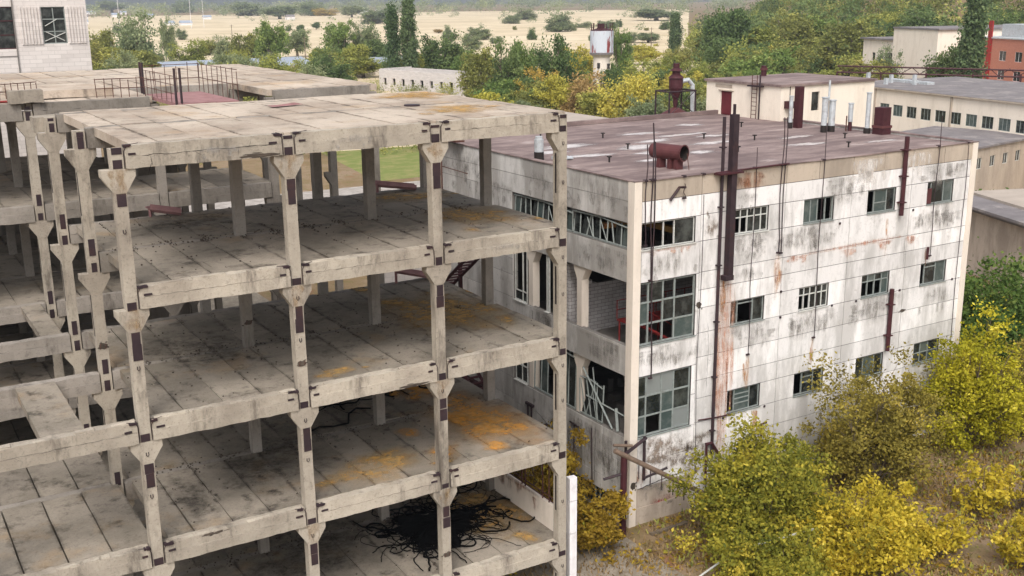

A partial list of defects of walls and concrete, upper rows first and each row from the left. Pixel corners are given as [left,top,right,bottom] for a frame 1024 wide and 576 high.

corrosion [716,281,749,414]